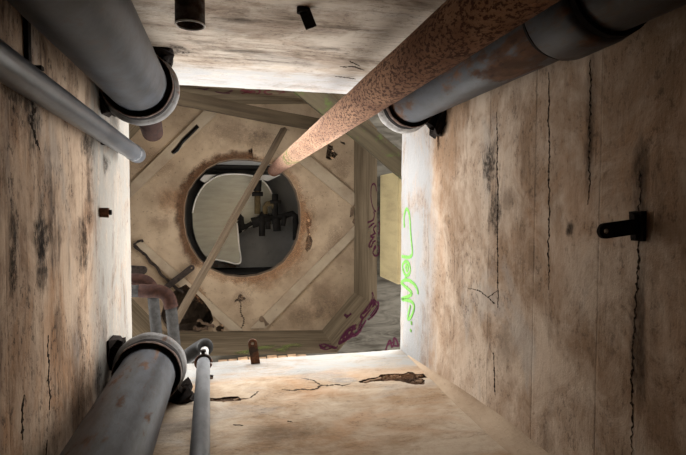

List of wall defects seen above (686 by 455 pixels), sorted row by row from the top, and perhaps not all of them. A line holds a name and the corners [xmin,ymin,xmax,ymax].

crack [585,60,593,205]
leakage [9,213,17,294]
leakage [35,212,52,287]
corrosion [176,151,255,264]
crack [473,112,499,308]
leakage [483,147,501,230]
crack [545,72,553,290]
crack [45,335,53,410]
crack [282,378,348,391]
spalling [363,373,427,385]
crack [630,241,640,455]